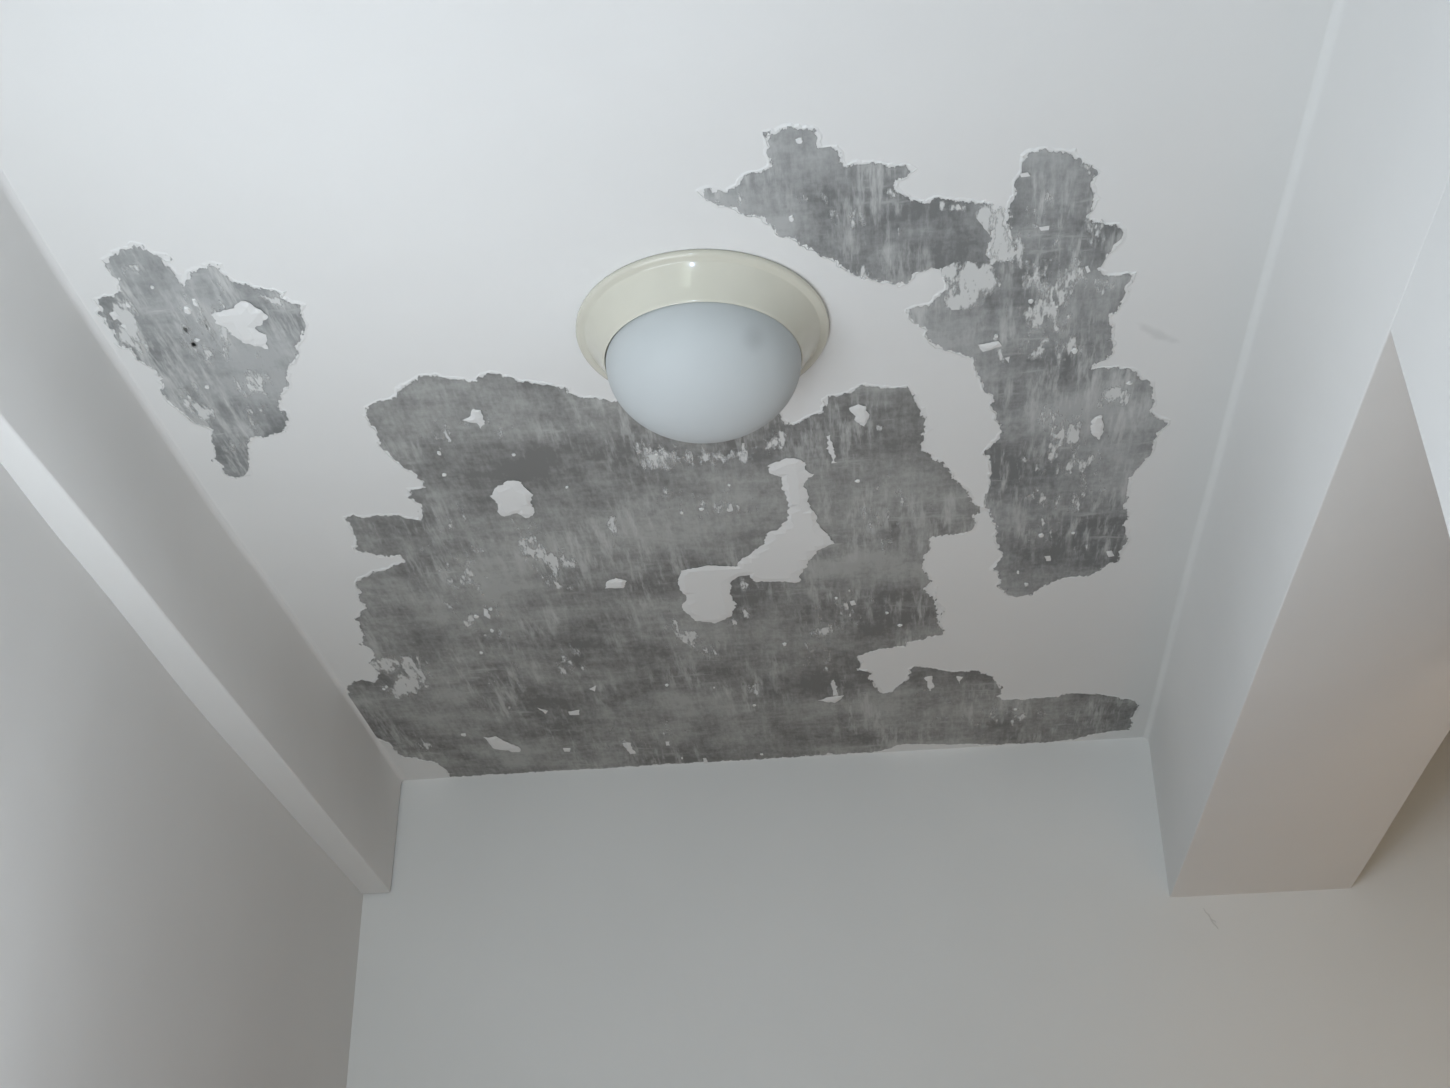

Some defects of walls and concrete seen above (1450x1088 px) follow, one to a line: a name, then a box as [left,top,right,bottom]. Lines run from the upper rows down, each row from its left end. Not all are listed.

peeling [91,241,309,479]
peeling [343,123,1171,778]